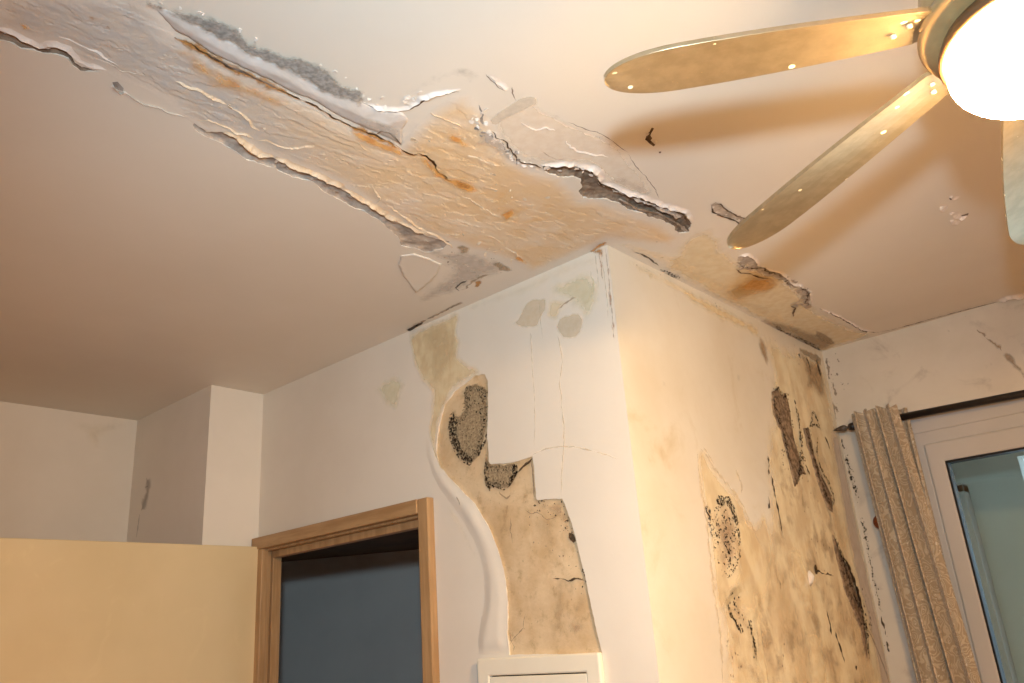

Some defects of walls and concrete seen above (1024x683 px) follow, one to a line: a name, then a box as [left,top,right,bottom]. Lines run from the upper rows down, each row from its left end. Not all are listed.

flaking render [0,0,695,293]
damp [407,258,577,544]
flaking render [437,374,602,655]
damp [558,297,581,337]
damp [566,123,658,195]
flaking render [711,202,744,224]
peeling [736,253,814,317]
damp [702,325,890,683]